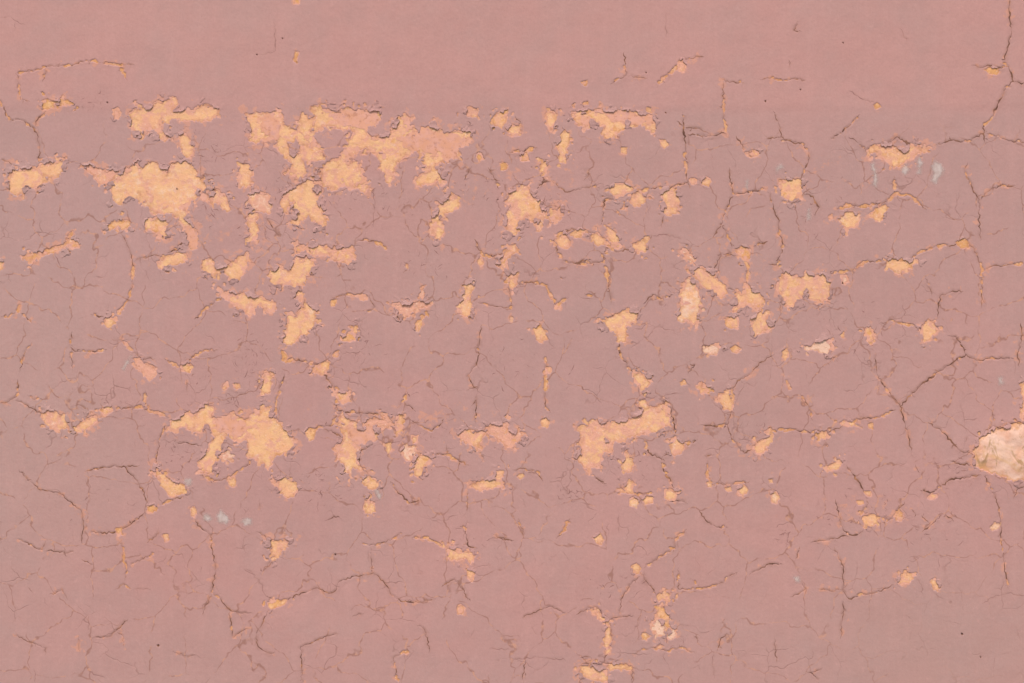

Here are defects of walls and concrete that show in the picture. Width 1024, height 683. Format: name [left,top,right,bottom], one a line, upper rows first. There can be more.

crack [0,59,134,162]
crack [94,235,182,319]
peeling [2,92,529,519]
peeling [455,103,712,320]
crack [460,2,1024,682]
peeling [672,244,849,361]
crack [19,393,195,590]
crack [195,350,470,681]
crack [401,392,483,465]
peeling [572,365,684,508]
spalling [972,376,1024,488]
peeling [641,588,678,651]